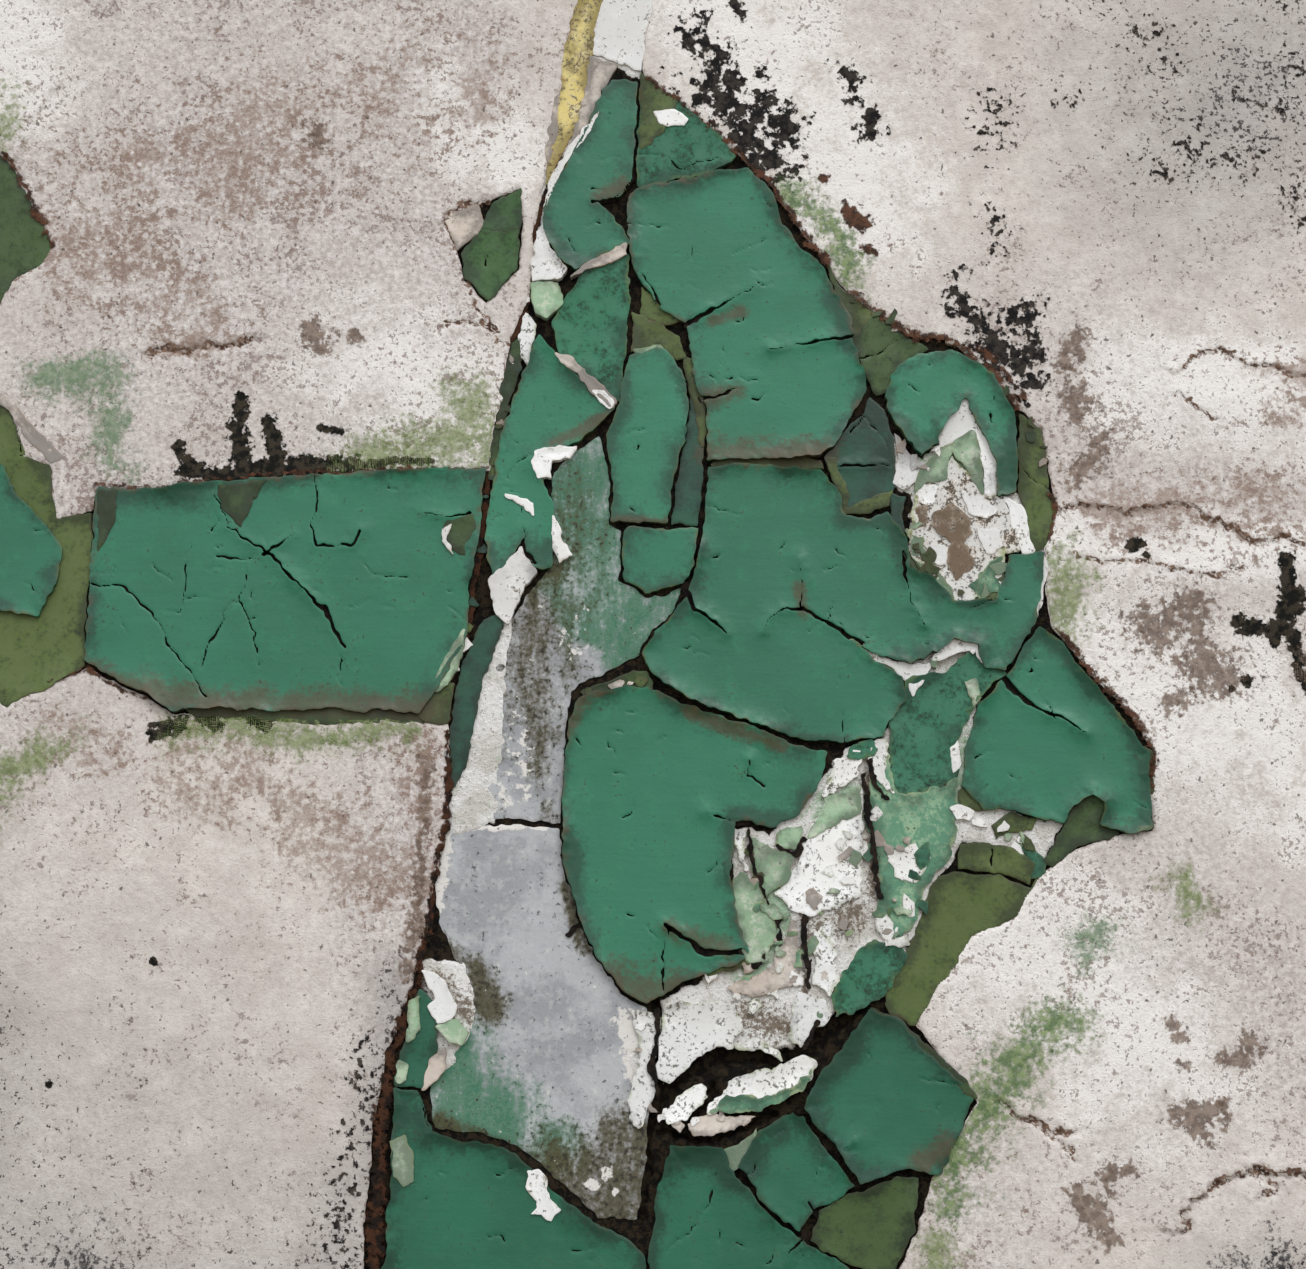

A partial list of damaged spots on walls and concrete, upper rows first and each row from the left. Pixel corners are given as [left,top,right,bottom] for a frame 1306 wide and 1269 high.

leakage [660,8,816,193]
leakage [824,58,891,144]
peeling [0,156,51,303]
crack [532,157,563,244]
leakage [840,198,879,256]
crack [1175,346,1306,421]
leakage [170,390,435,481]
peeling [0,393,489,725]
crack [1057,501,1306,579]
peeling [381,0,1156,1269]
leakage [1119,548,1306,720]
crack [1180,1164,1306,1233]